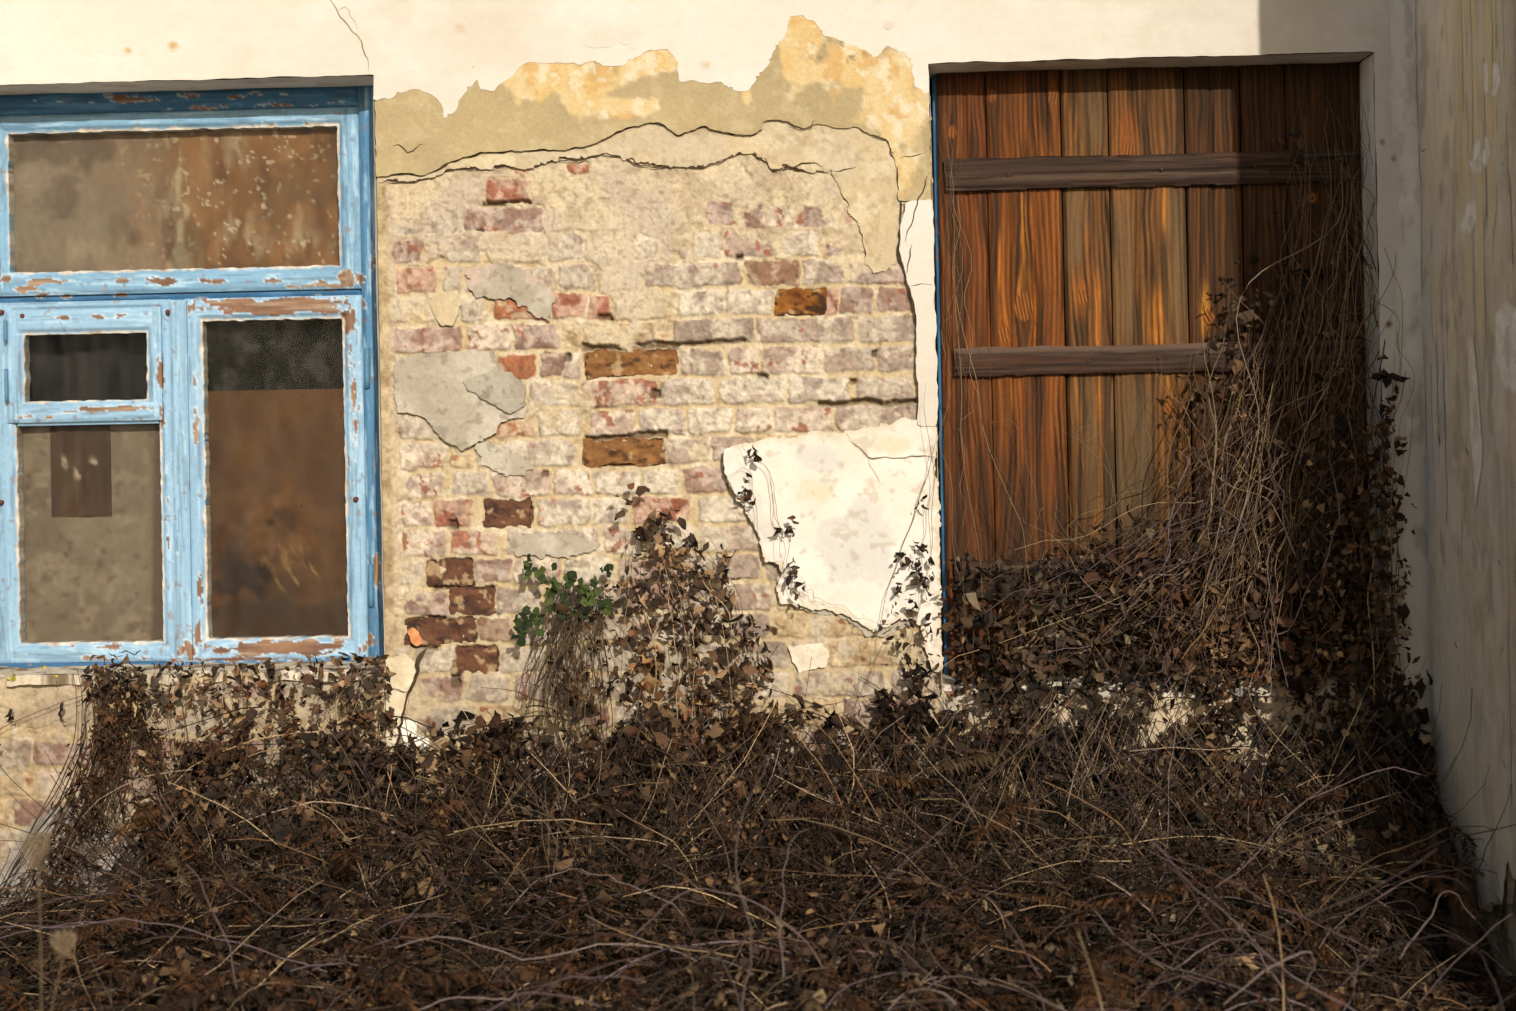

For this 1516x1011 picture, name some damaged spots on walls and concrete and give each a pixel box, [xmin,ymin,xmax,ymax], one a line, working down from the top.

crack [330,0,369,70]
spalling [0,15,1389,883]
spalling [1423,778,1516,988]